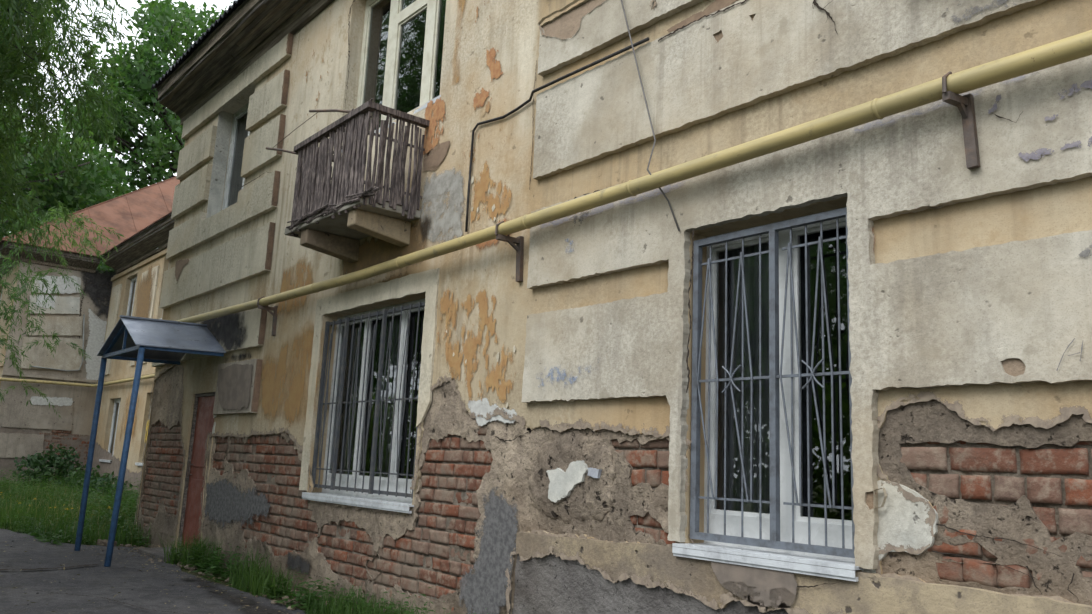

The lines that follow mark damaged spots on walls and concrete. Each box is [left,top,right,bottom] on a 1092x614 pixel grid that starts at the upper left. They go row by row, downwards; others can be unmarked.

spalling [539,0,606,40]
crack [658,0,746,42]
crack [812,0,837,33]
peeling [473,47,503,113]
peeling [423,97,450,171]
peeling [459,134,512,223]
spalling [0,363,185,548]
spalling [198,286,809,614]
spalling [862,391,1092,606]